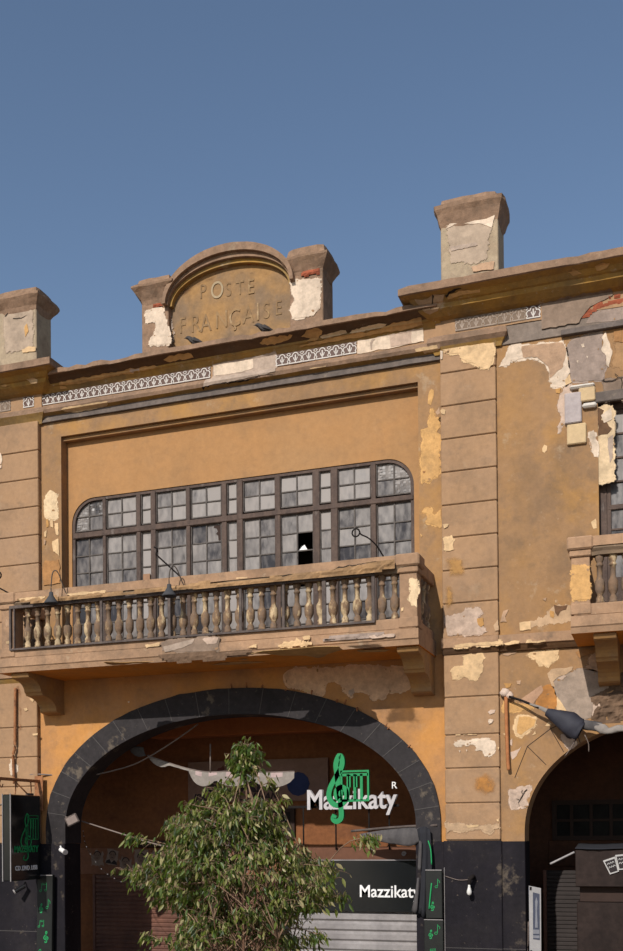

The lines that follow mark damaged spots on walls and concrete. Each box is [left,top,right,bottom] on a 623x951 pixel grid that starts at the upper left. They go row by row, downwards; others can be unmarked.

peeling [446,215,495,272]
peeling [144,303,175,347]
peeling [59,365,157,389]
peeling [203,268,623,485]
spalling [17,490,395,604]
peeling [103,632,411,701]
spalling [444,564,623,760]